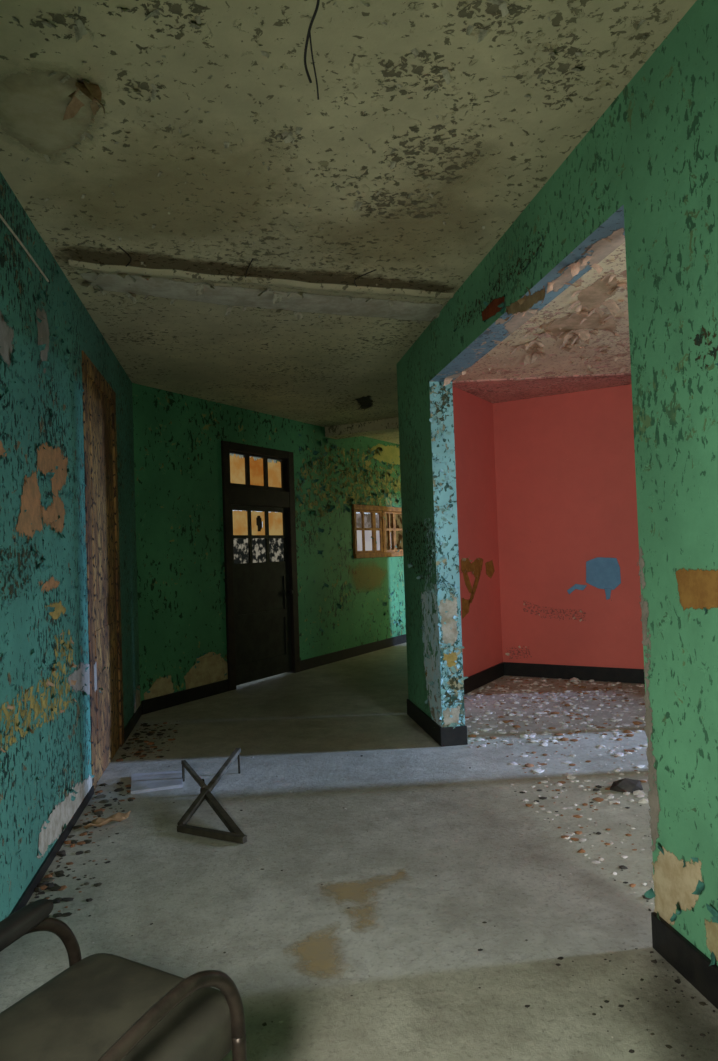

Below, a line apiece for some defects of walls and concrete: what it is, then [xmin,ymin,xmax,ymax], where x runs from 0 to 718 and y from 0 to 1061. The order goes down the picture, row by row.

peeling [429,228,631,482]
flaking render [0,245,106,858]
flaking render [134,652,228,713]
peeling [395,505,468,729]
peeling [567,557,621,600]
flaking render [637,546,718,966]